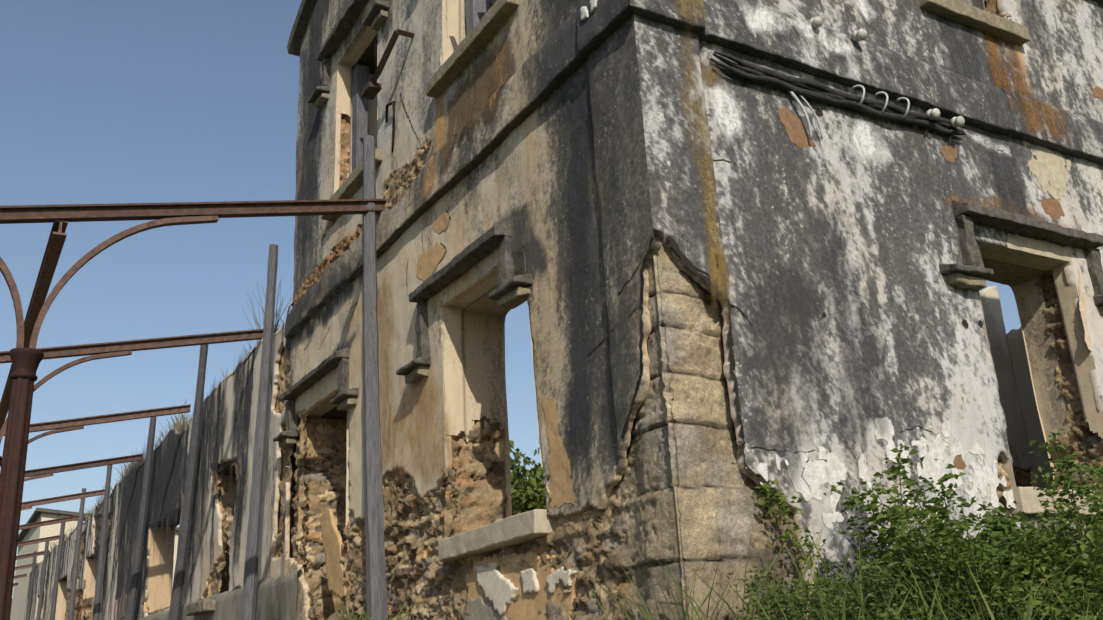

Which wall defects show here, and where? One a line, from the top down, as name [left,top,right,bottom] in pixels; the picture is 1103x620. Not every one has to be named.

leakage [701,62,719,87]
flaking render [376,137,432,217]
peeling [1023,140,1071,222]
flaking render [291,224,363,310]
leakage [567,83,594,457]
leakage [95,358,247,620]
flaking render [205,458,240,598]
flaking render [273,347,368,620]
leakage [602,306,632,442]
flaking render [383,234,872,620]
peeling [875,417,1033,519]
flaking render [1035,268,1103,490]